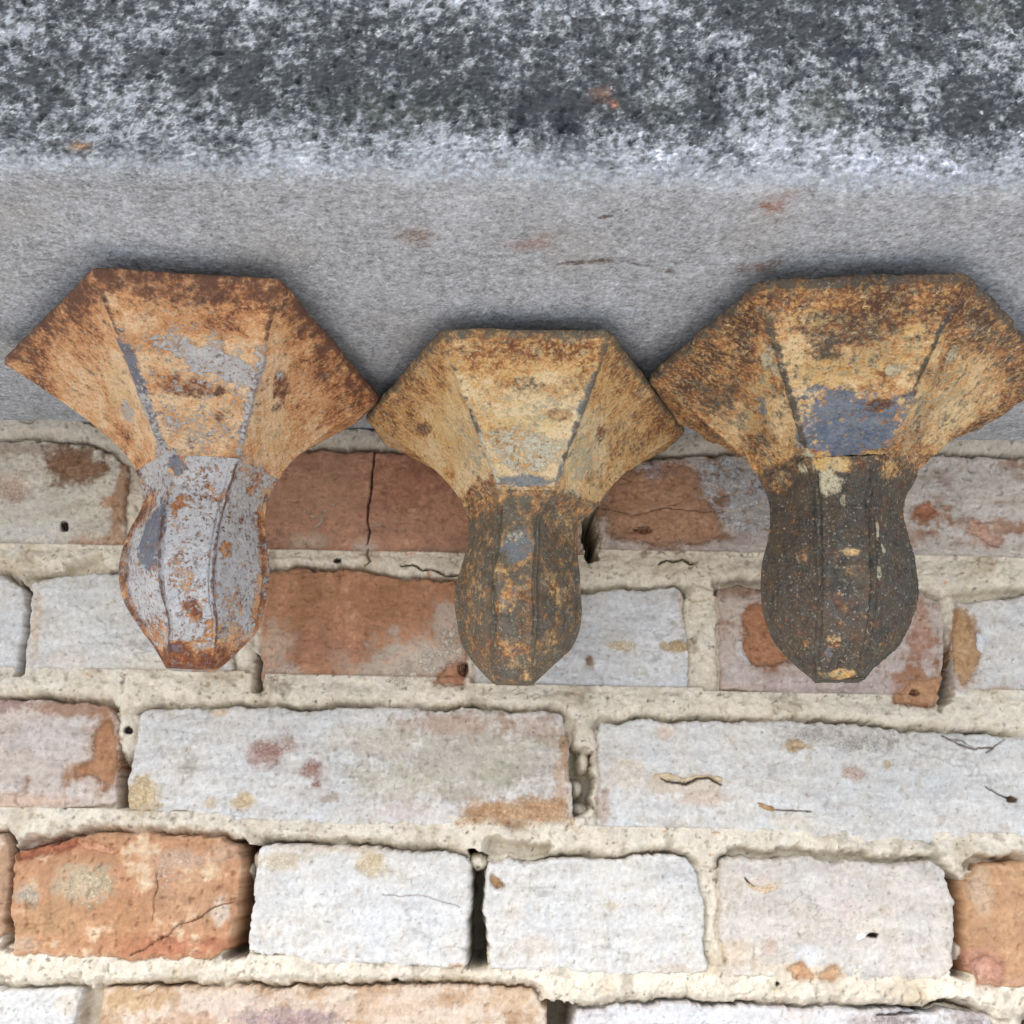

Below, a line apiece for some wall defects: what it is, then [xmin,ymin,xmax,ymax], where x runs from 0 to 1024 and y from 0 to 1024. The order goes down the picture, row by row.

crack [367,453,375,565]
corrosion [660,641,688,652]
crack [130,901,234,955]